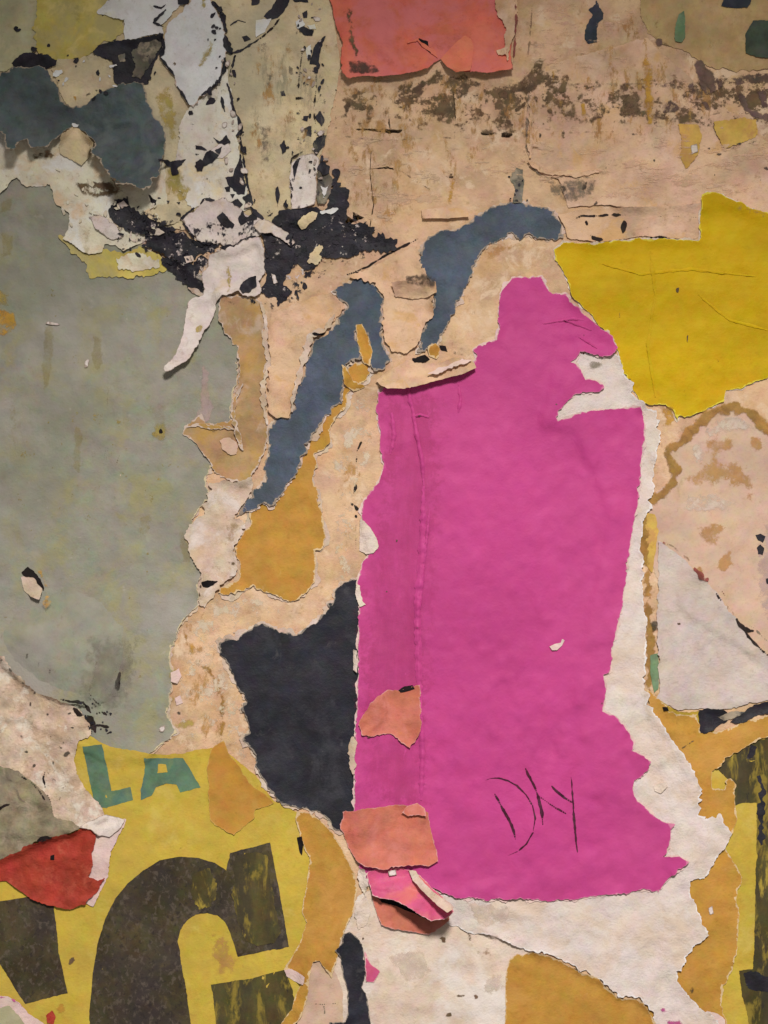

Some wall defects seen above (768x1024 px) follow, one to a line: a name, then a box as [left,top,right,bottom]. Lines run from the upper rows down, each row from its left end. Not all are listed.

peeling [61,0,398,309]
leakage [342,6,768,229]